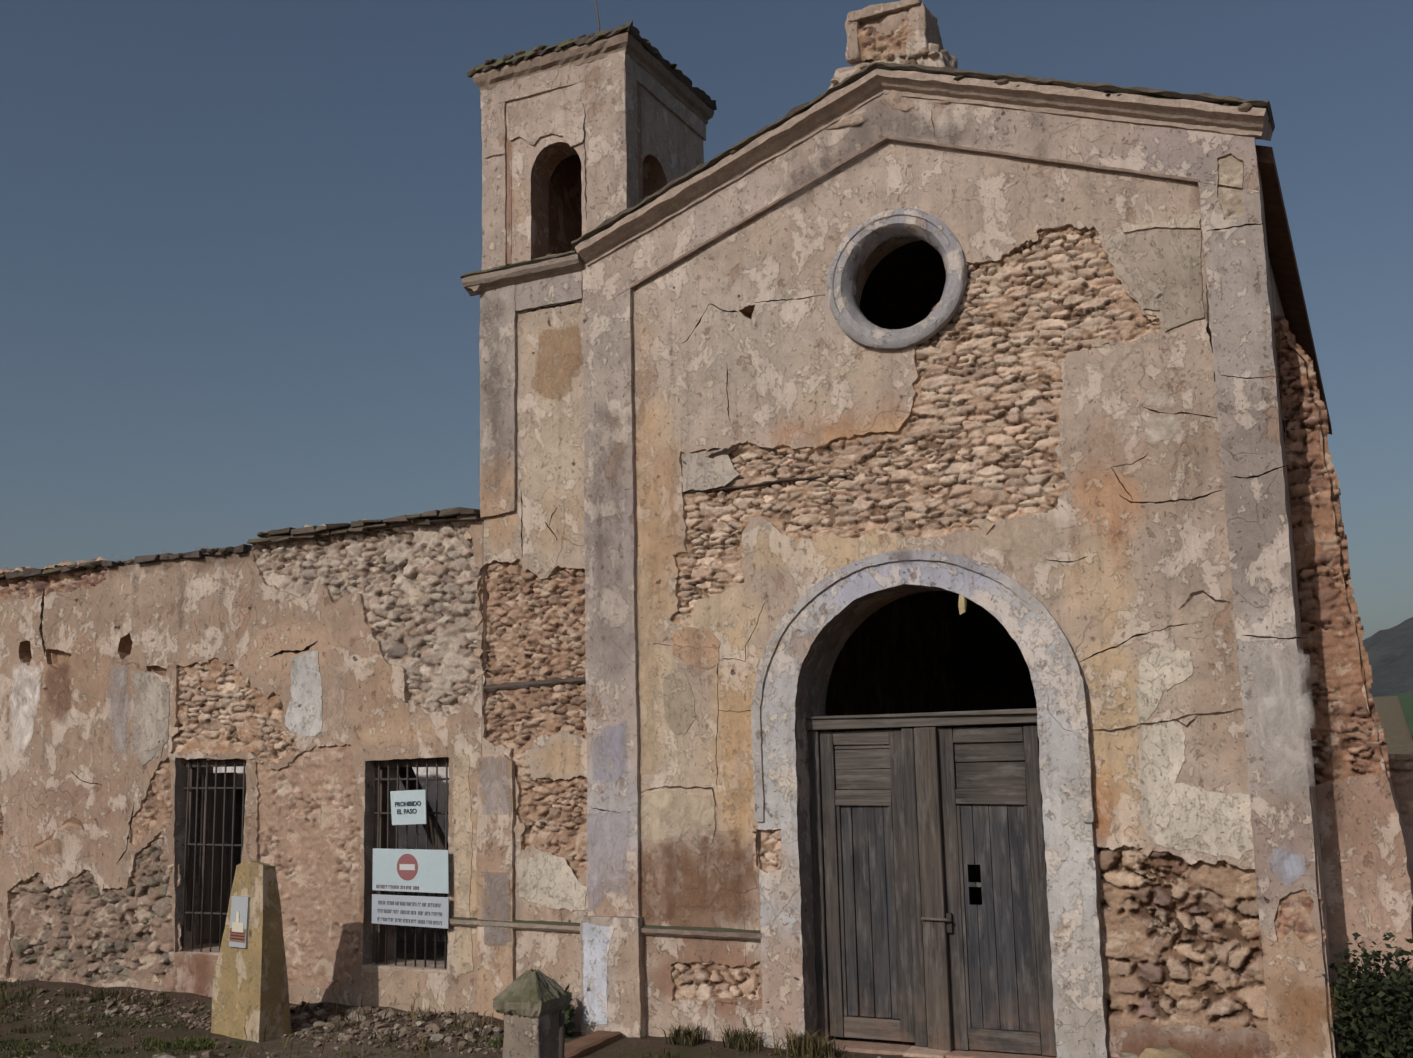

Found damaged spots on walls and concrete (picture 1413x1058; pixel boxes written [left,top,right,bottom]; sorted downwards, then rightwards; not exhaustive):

spalling [739,305,755,319]
crack [683,295,825,343]
peeling [966,209,1205,332]
crack [1206,284,1278,381]
crack [1111,453,1290,504]
peeling [670,448,740,628]
crack [38,589,46,657]
spalling [352,593,458,715]
crack [1079,590,1231,662]
crack [1095,709,1236,732]
spalling [50,632,367,989]
peeling [472,559,714,1025]